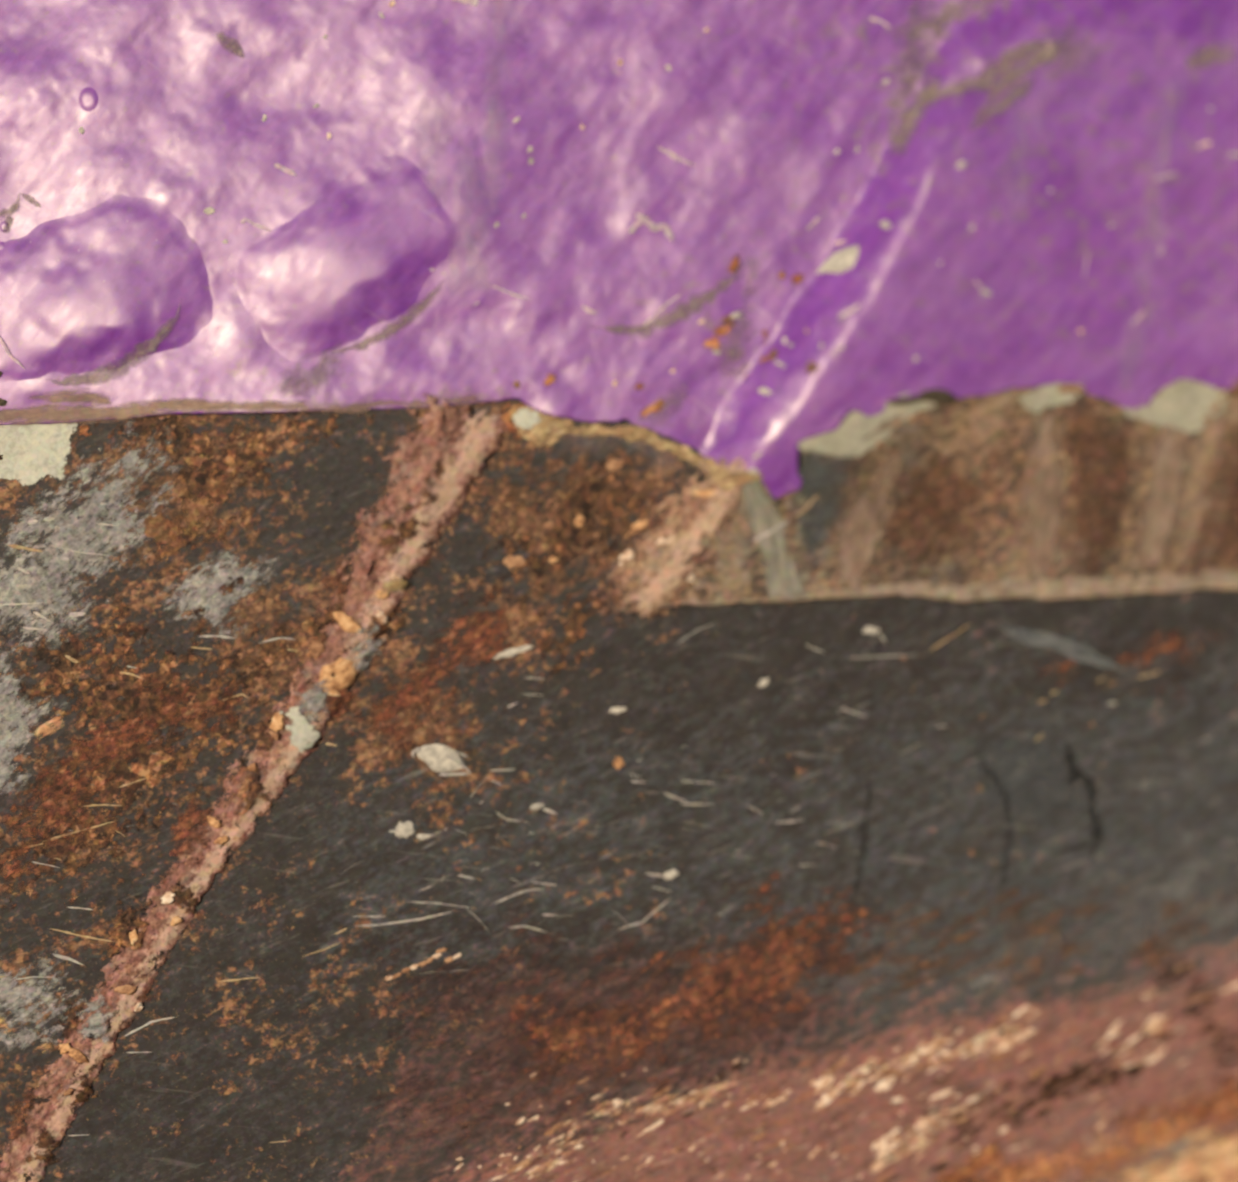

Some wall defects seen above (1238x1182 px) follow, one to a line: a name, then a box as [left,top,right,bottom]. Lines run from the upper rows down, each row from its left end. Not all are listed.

peeling [512,406,764,492]
peeling [798,388,955,458]
peeling [1018,382,1085,413]
peeling [1120,379,1229,568]
peeling [164,549,276,640]
corrosion [0,400,524,909]
peeling [279,672,335,752]
crack [1063,748,1102,854]
corrosion [102,873,198,960]
corrosion [37,992,89,1052]
corrosion [9,1088,60,1165]
corrosion [62,1064,109,1105]